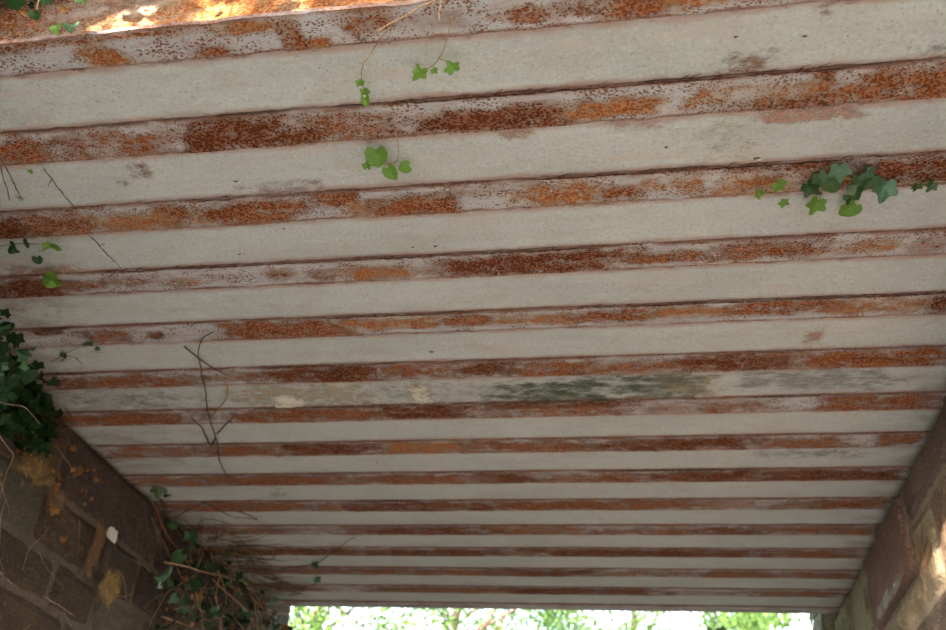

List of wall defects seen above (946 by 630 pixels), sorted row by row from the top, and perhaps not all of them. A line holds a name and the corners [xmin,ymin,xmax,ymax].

rust [0,0,467,68]
rust [0,52,946,177]
rust [0,187,468,239]
rust [265,235,945,283]
damp [231,384,376,408]
damp [403,381,440,405]
rust [42,348,946,390]
damp [488,373,715,401]
damp [734,369,891,390]
rust [99,434,927,459]
rust [130,469,911,487]
rust [159,500,758,512]